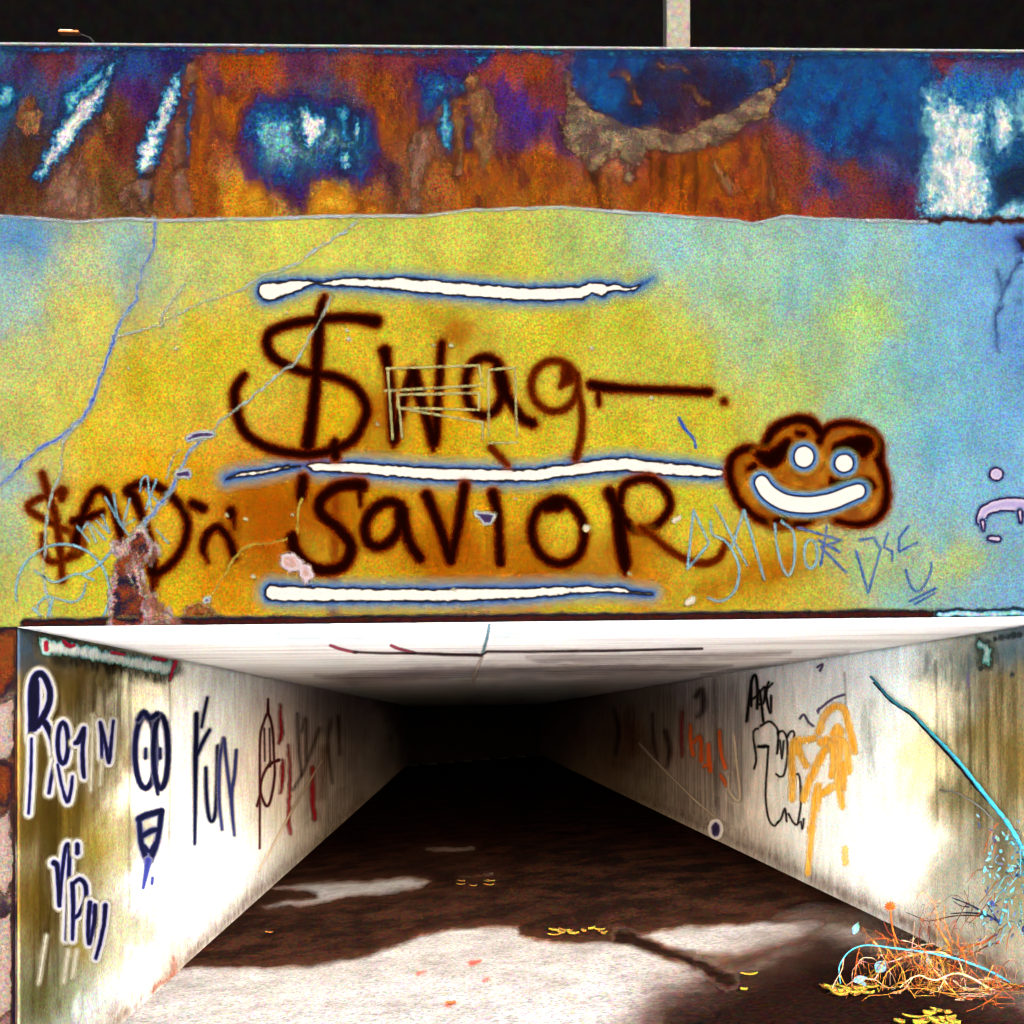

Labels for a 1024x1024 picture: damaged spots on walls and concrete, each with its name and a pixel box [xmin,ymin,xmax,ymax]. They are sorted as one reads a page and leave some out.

rust [193,60,249,184]
rust [377,72,416,151]
rust [243,183,270,216]
rust [308,185,384,215]
rust [458,152,561,208]
rust [575,168,611,209]
rust [692,137,795,217]
crack [994,259,1023,351]
crack [0,217,358,618]
spalling [106,521,220,626]
damp [926,632,1022,861]